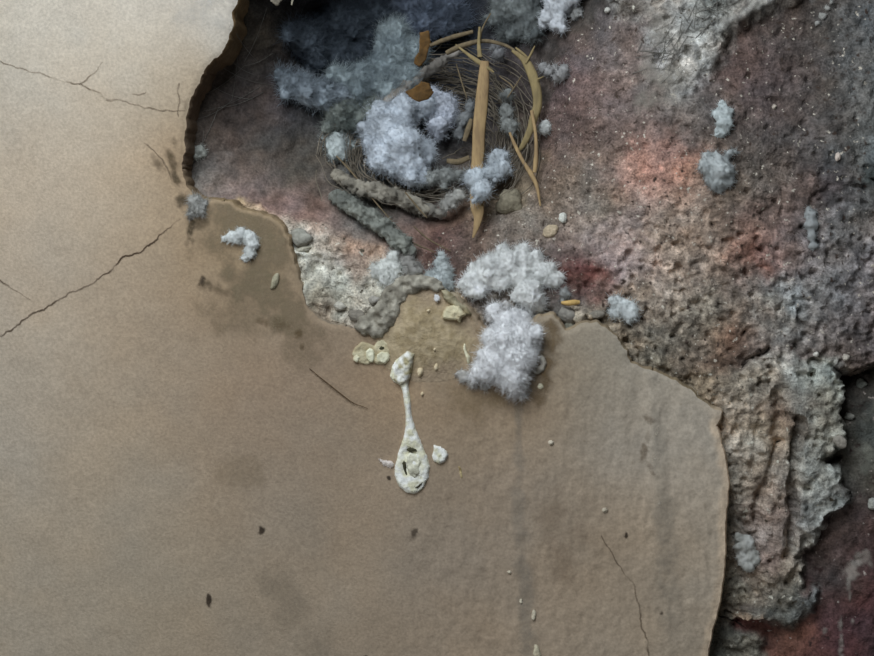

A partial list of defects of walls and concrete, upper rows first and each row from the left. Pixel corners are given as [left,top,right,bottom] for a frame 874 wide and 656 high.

crack [4,296,66,334]
crack [96,228,168,280]
leakage [188,204,304,336]
spalling [182,0,874,656]